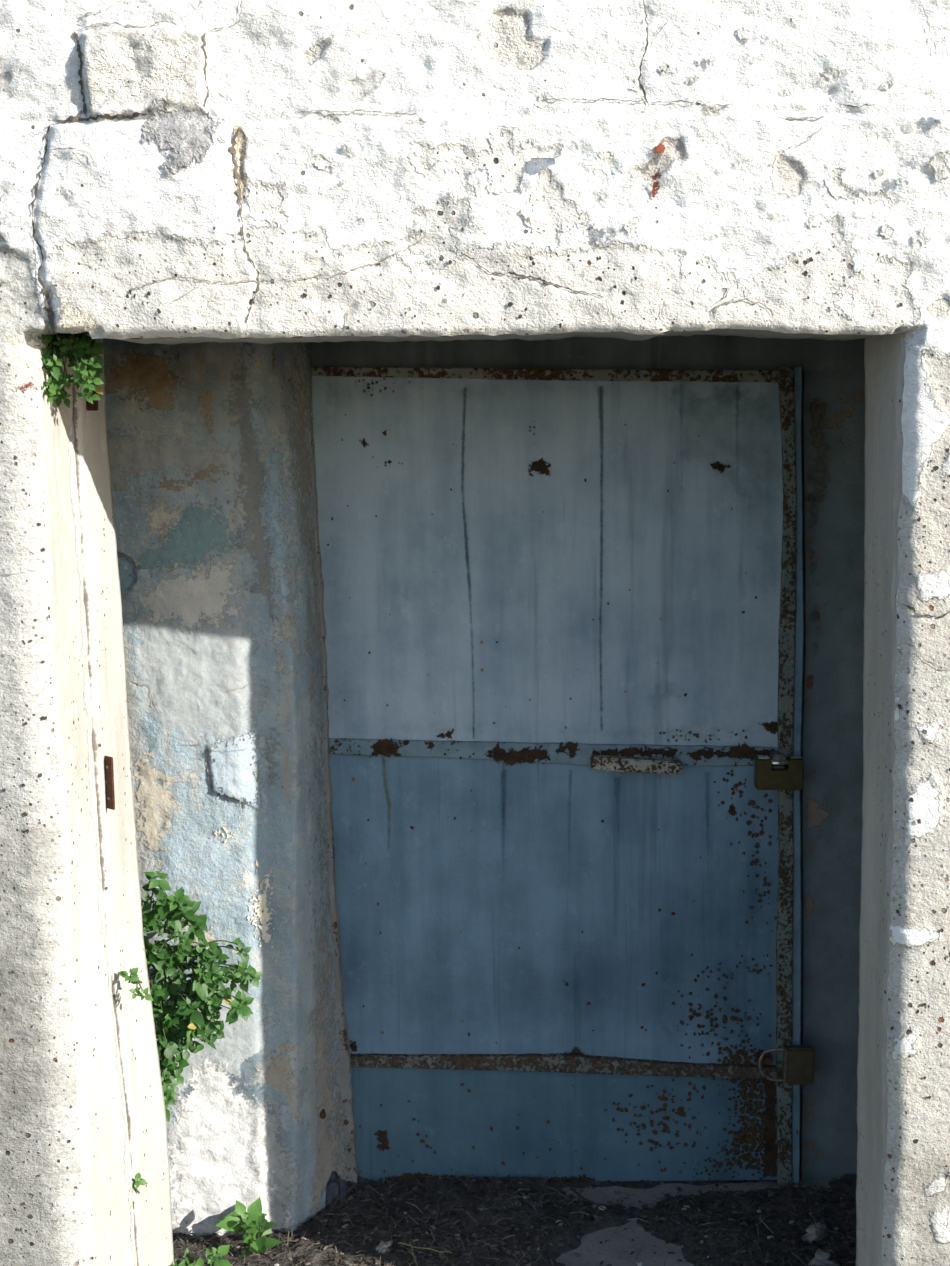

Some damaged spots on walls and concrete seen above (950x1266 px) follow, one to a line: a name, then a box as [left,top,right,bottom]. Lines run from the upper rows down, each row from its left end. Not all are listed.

crack [530,0,733,110]
crack [0,123,98,334]
crack [130,127,428,336]
peeling [50,124,921,345]
crack [458,252,615,327]
rust [528,458,551,477]
peeling [104,345,321,813]
peeling [0,236,94,1266]
rust [369,739,409,758]
rust [424,720,778,923]
peeling [882,346,950,1266]
spalling [168,710,347,1236]